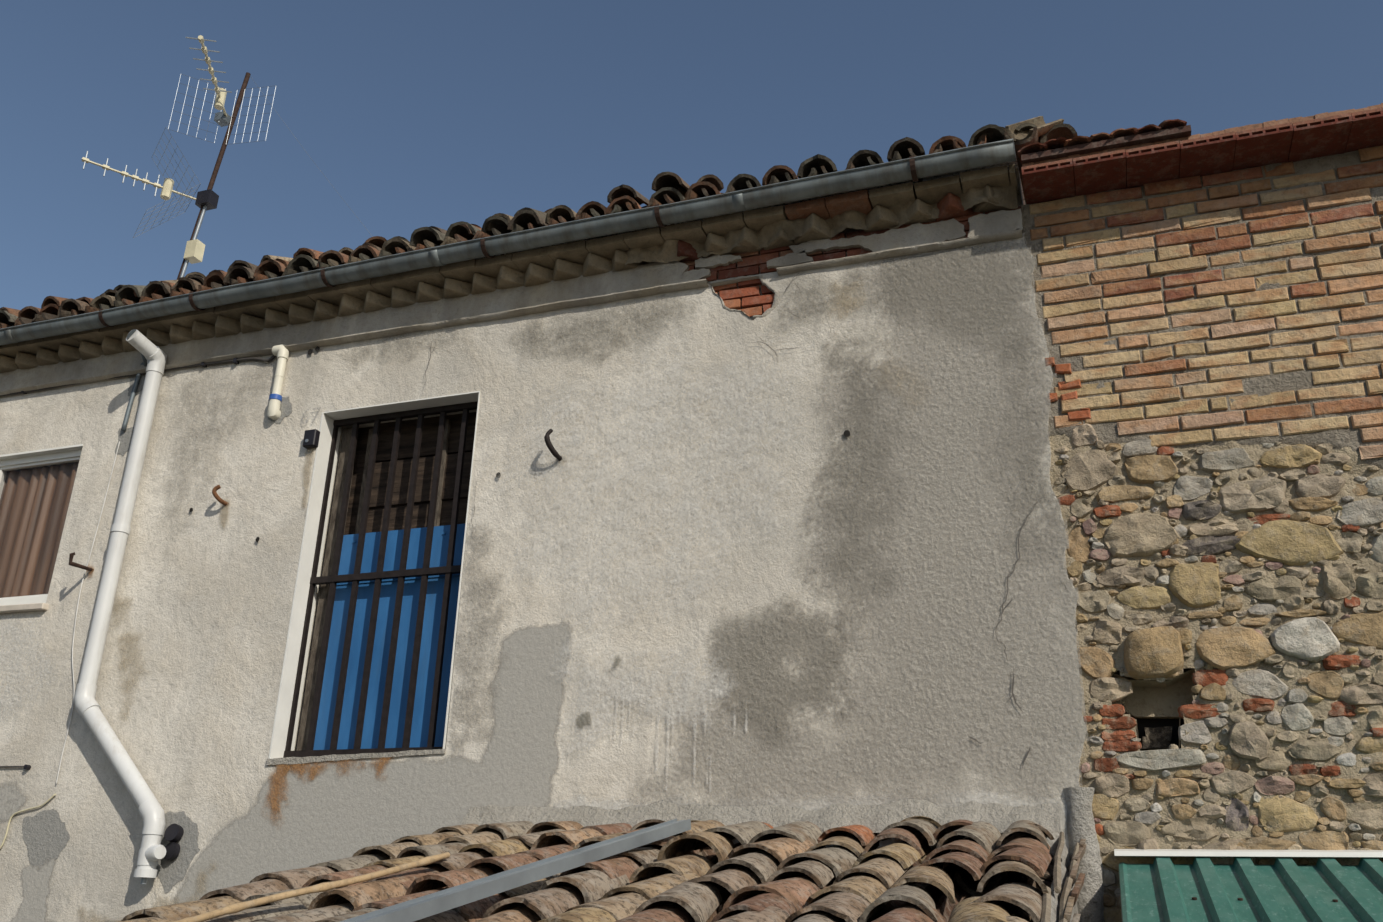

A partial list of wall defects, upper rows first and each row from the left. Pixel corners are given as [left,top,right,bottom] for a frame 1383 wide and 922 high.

flaking render [677,189,1024,320]
water stain [564,246,1088,807]
crack [995,493,1046,712]
corrosion [268,760,349,819]